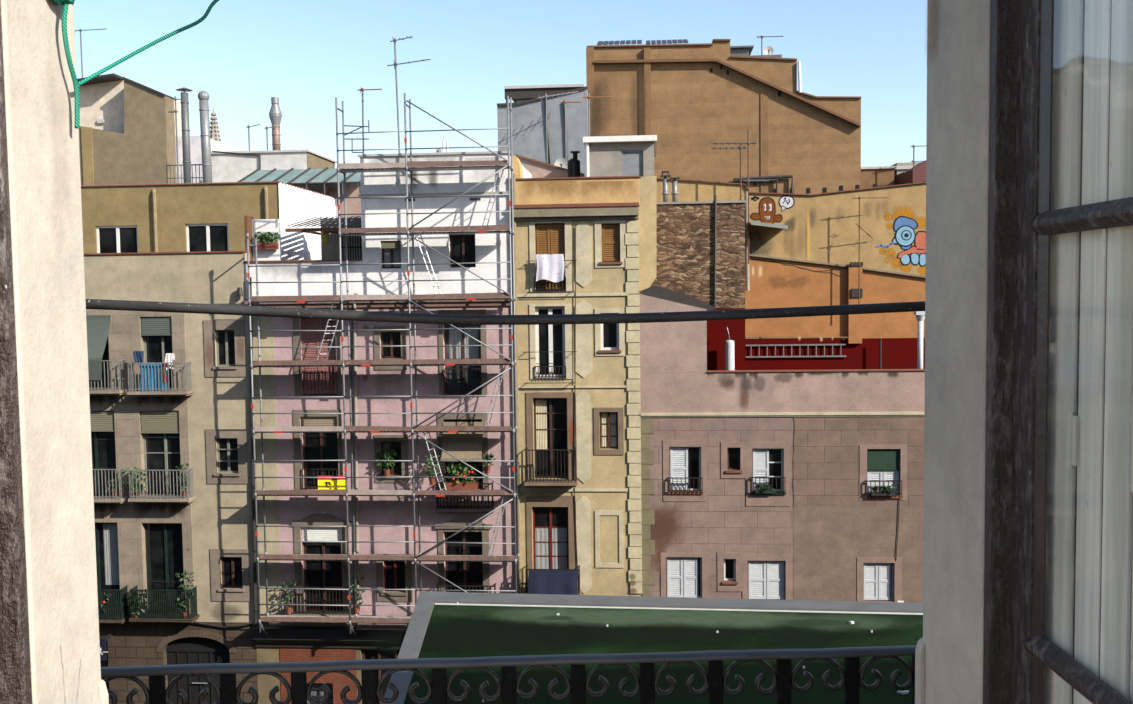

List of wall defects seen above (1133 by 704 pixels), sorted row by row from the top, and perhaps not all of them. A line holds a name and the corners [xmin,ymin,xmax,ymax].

leakage [725,372,758,401]